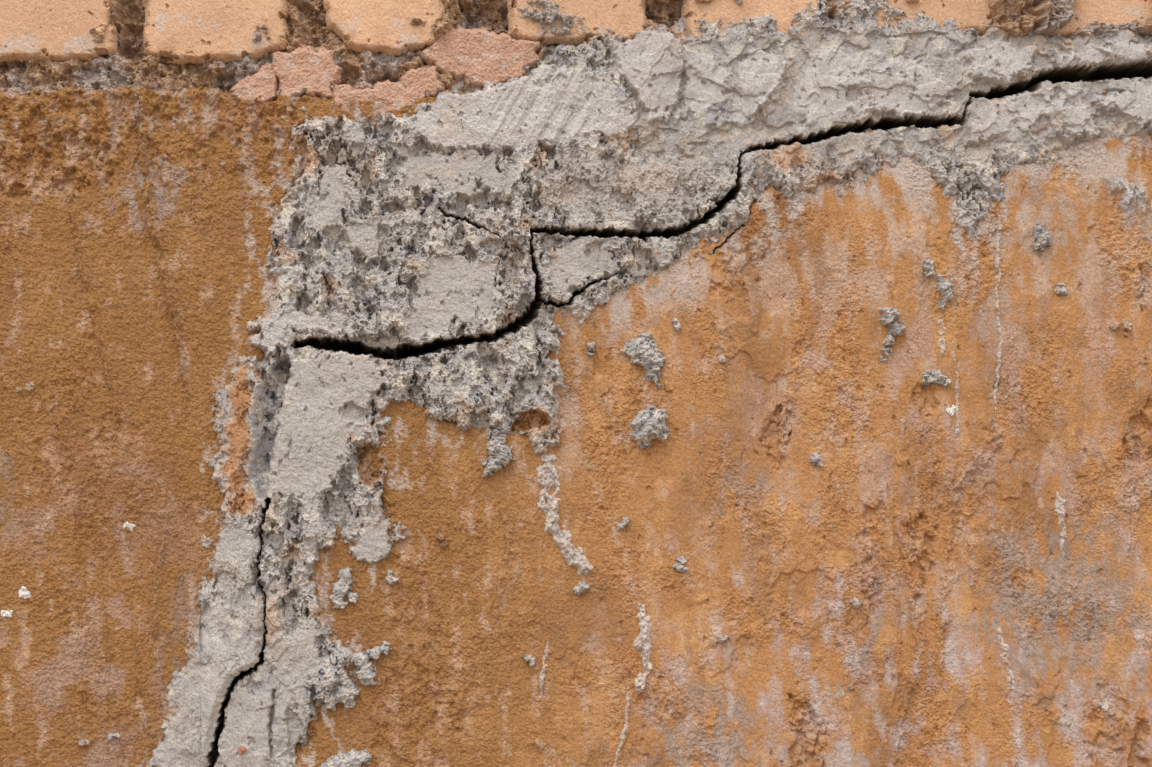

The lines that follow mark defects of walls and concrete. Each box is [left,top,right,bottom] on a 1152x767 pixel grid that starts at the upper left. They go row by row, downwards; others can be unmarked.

crack [290,58,1152,361]
crack [206,497,272,767]